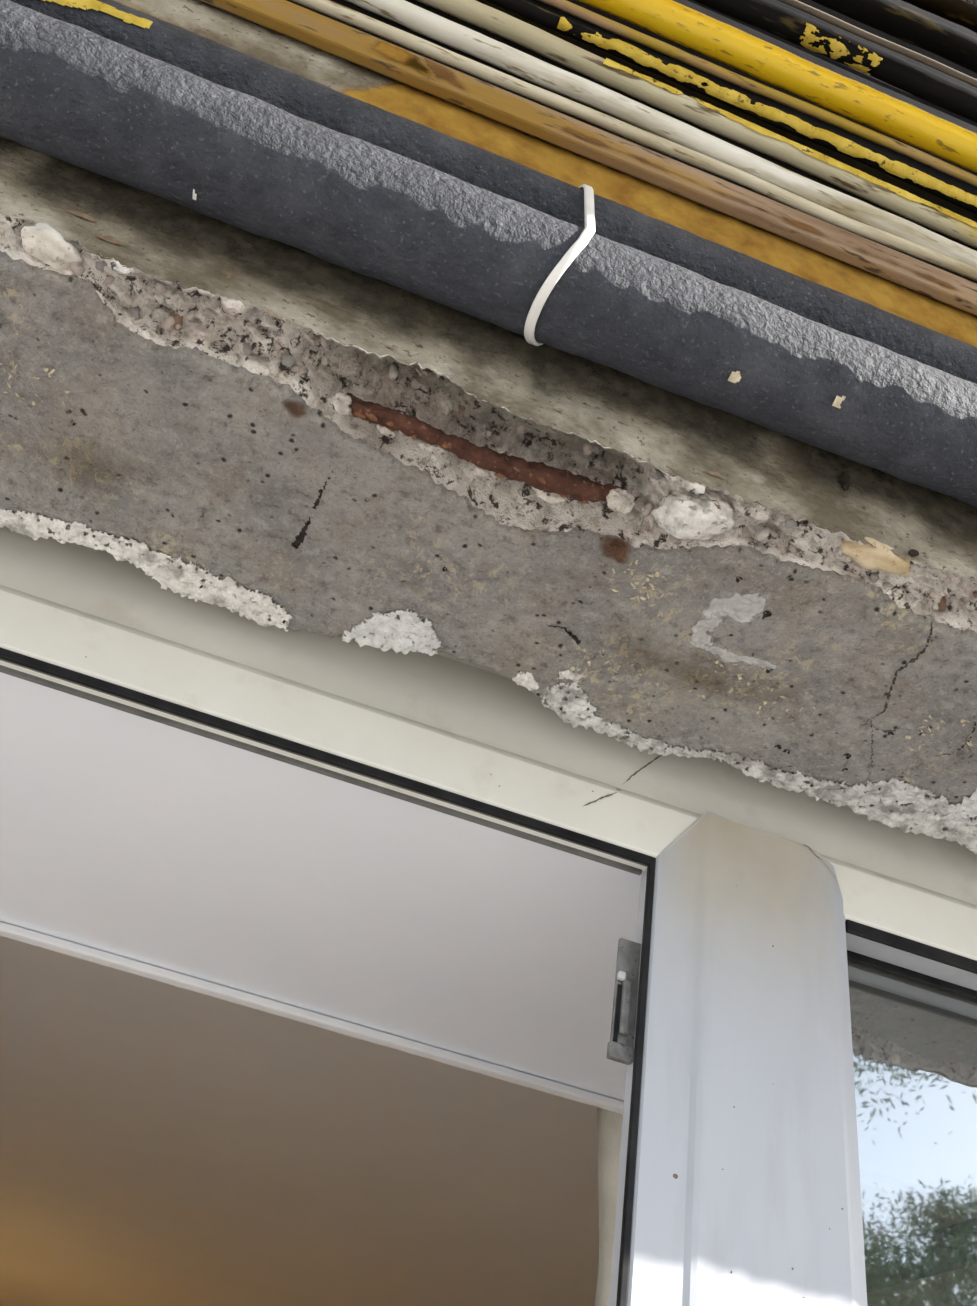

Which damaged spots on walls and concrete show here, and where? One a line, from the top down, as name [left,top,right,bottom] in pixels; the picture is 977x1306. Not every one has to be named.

spalling [0,209,977,633]
flaking render [342,609,441,656]
crack [584,755,662,806]
flaking render [512,625,977,854]
peeling [689,577,815,722]
crack [861,622,933,778]